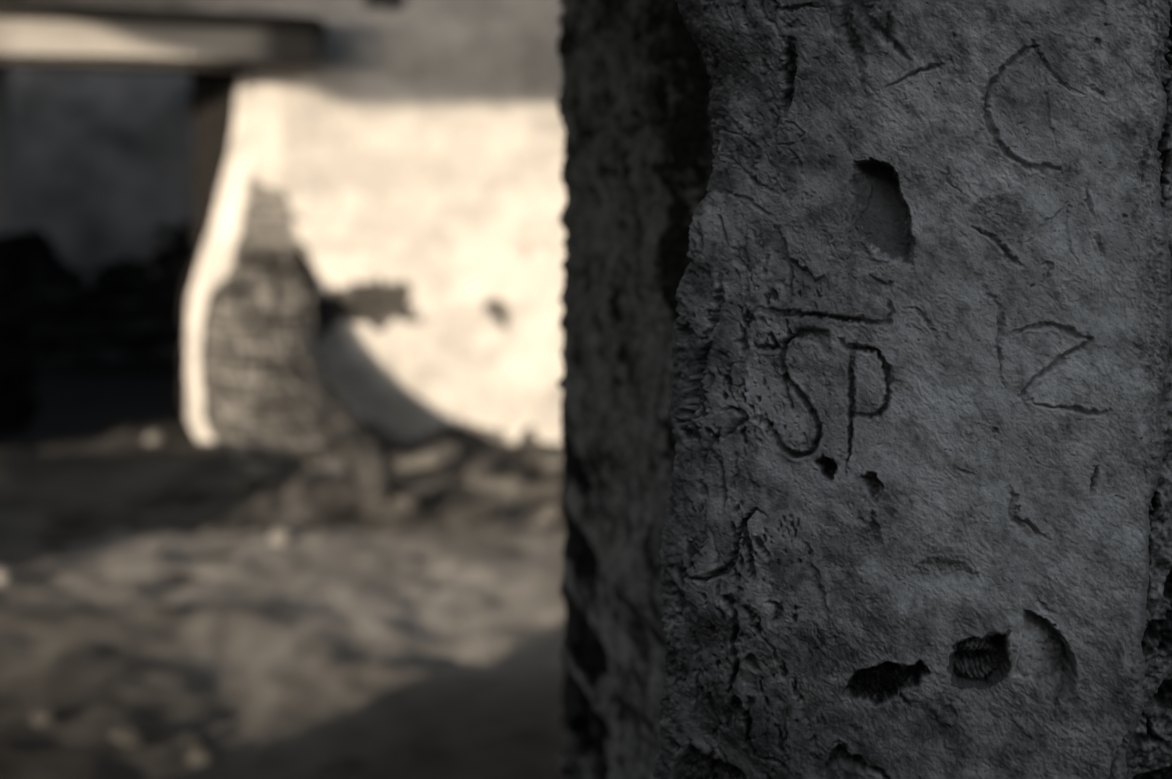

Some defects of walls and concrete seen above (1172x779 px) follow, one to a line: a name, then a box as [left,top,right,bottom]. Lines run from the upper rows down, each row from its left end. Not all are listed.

flaking render [4,221,212,376]
flaking render [200,172,424,442]
flaking render [357,417,537,446]